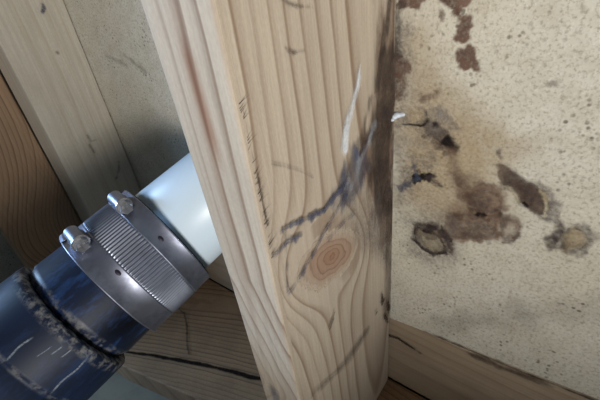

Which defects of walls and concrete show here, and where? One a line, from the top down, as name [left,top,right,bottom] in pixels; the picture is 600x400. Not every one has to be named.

damp [440,0,479,71]
damp [282,0,442,266]
damp [413,108,458,165]
damp [445,176,521,243]
damp [545,224,591,253]